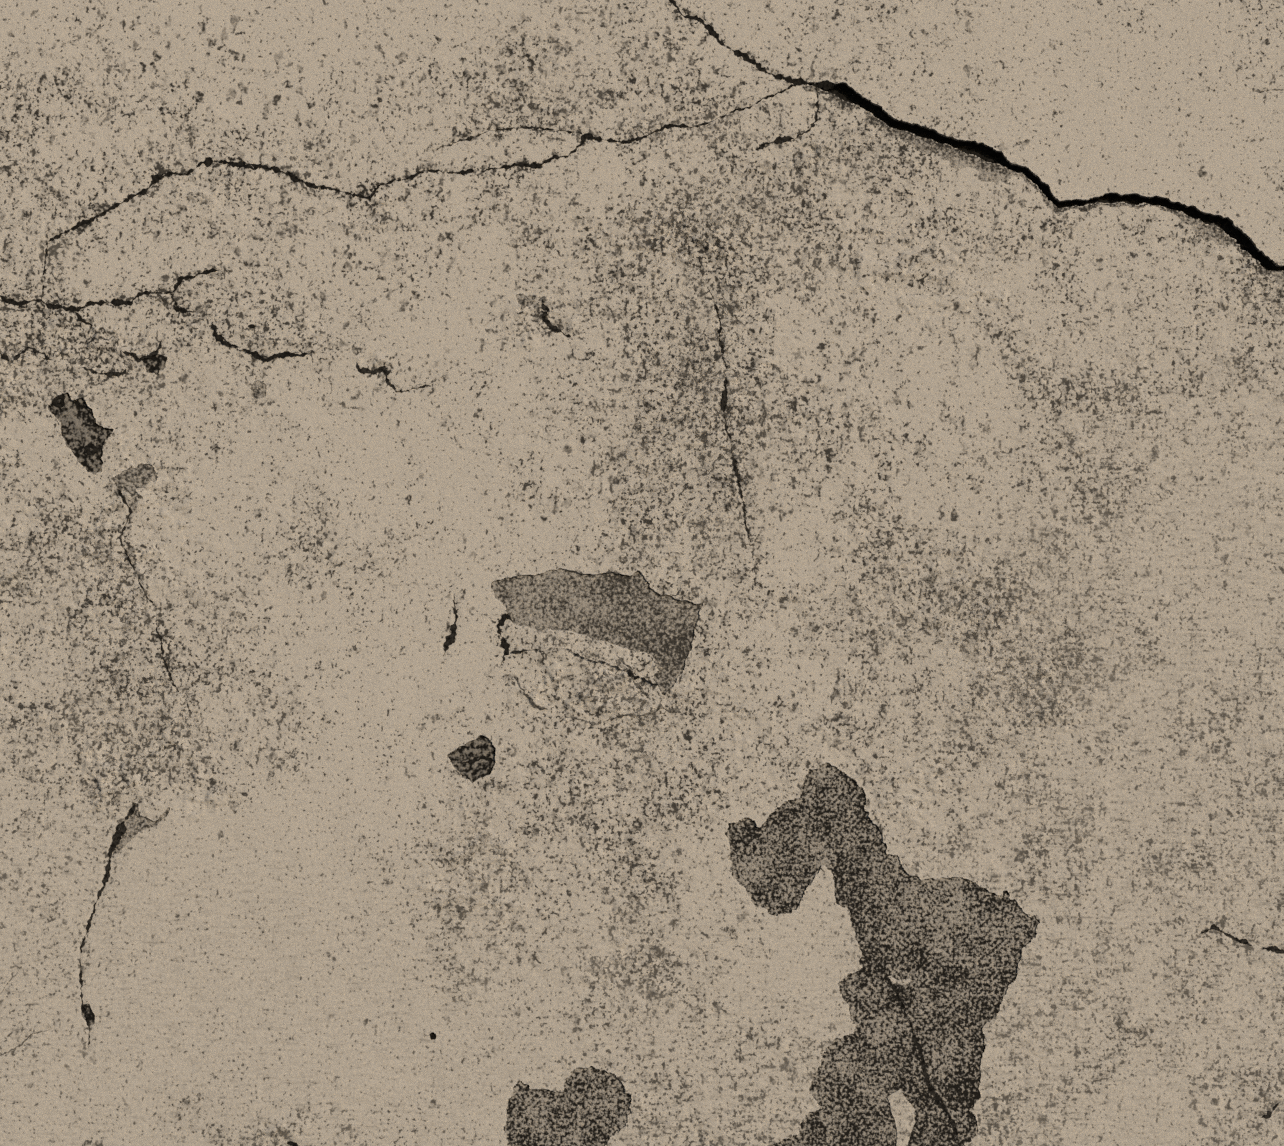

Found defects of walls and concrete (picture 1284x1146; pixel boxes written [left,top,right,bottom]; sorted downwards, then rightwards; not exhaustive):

crack [0,0,1284,326]
crack [541,299,571,337]
spalling [52,394,66,407]
crack [356,362,431,392]
spalling [84,443,98,455]
spalling [491,568,703,695]
crack [79,804,136,1049]
spalling [725,763,1040,1146]
spalling [504,1066,632,1146]